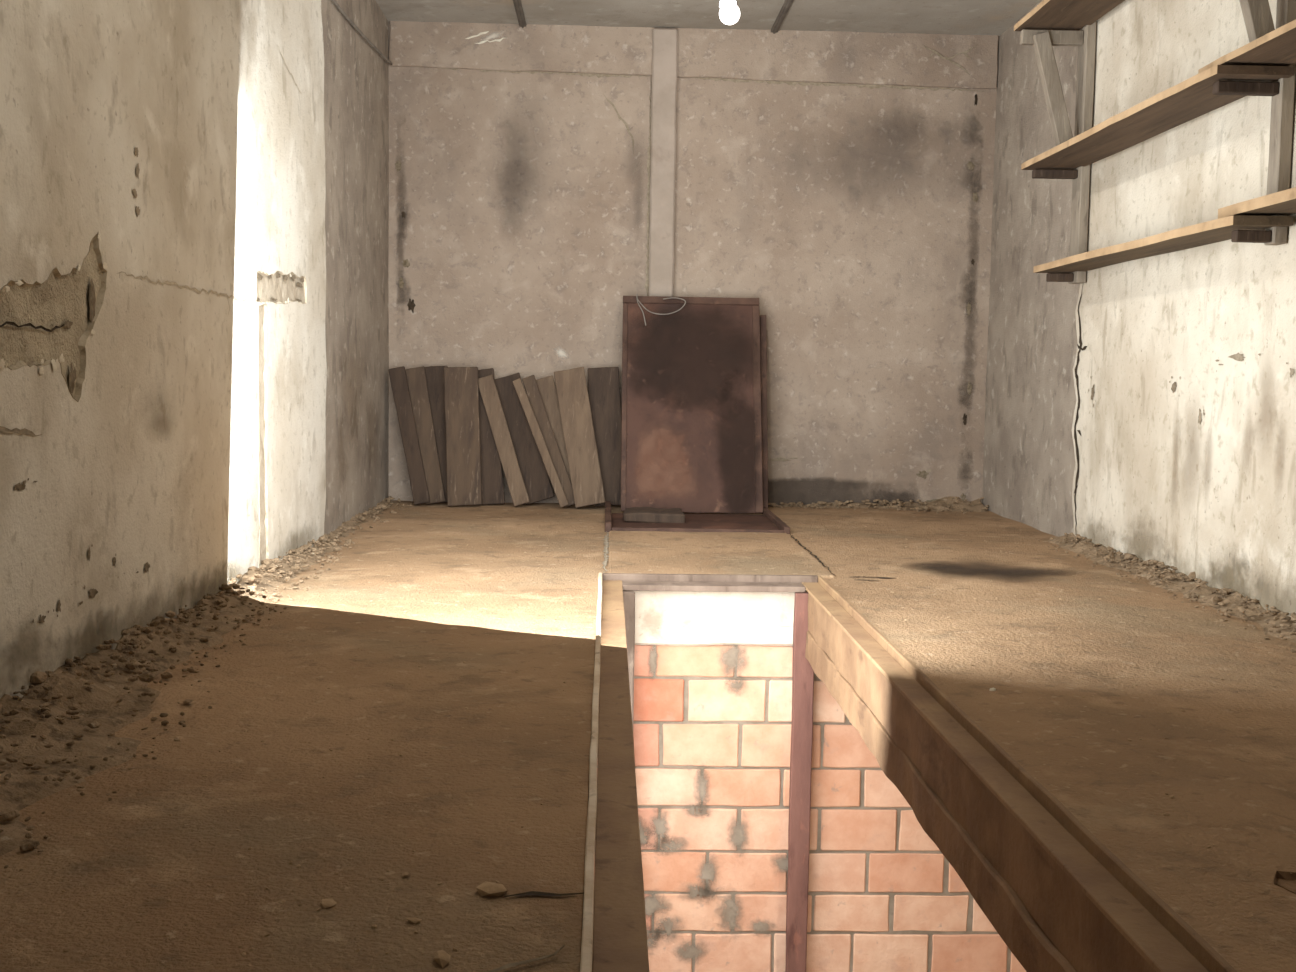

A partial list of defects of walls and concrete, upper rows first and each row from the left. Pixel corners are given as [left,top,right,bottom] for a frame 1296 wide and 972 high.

spalling [0,230,108,402]
spalling [256,271,307,568]